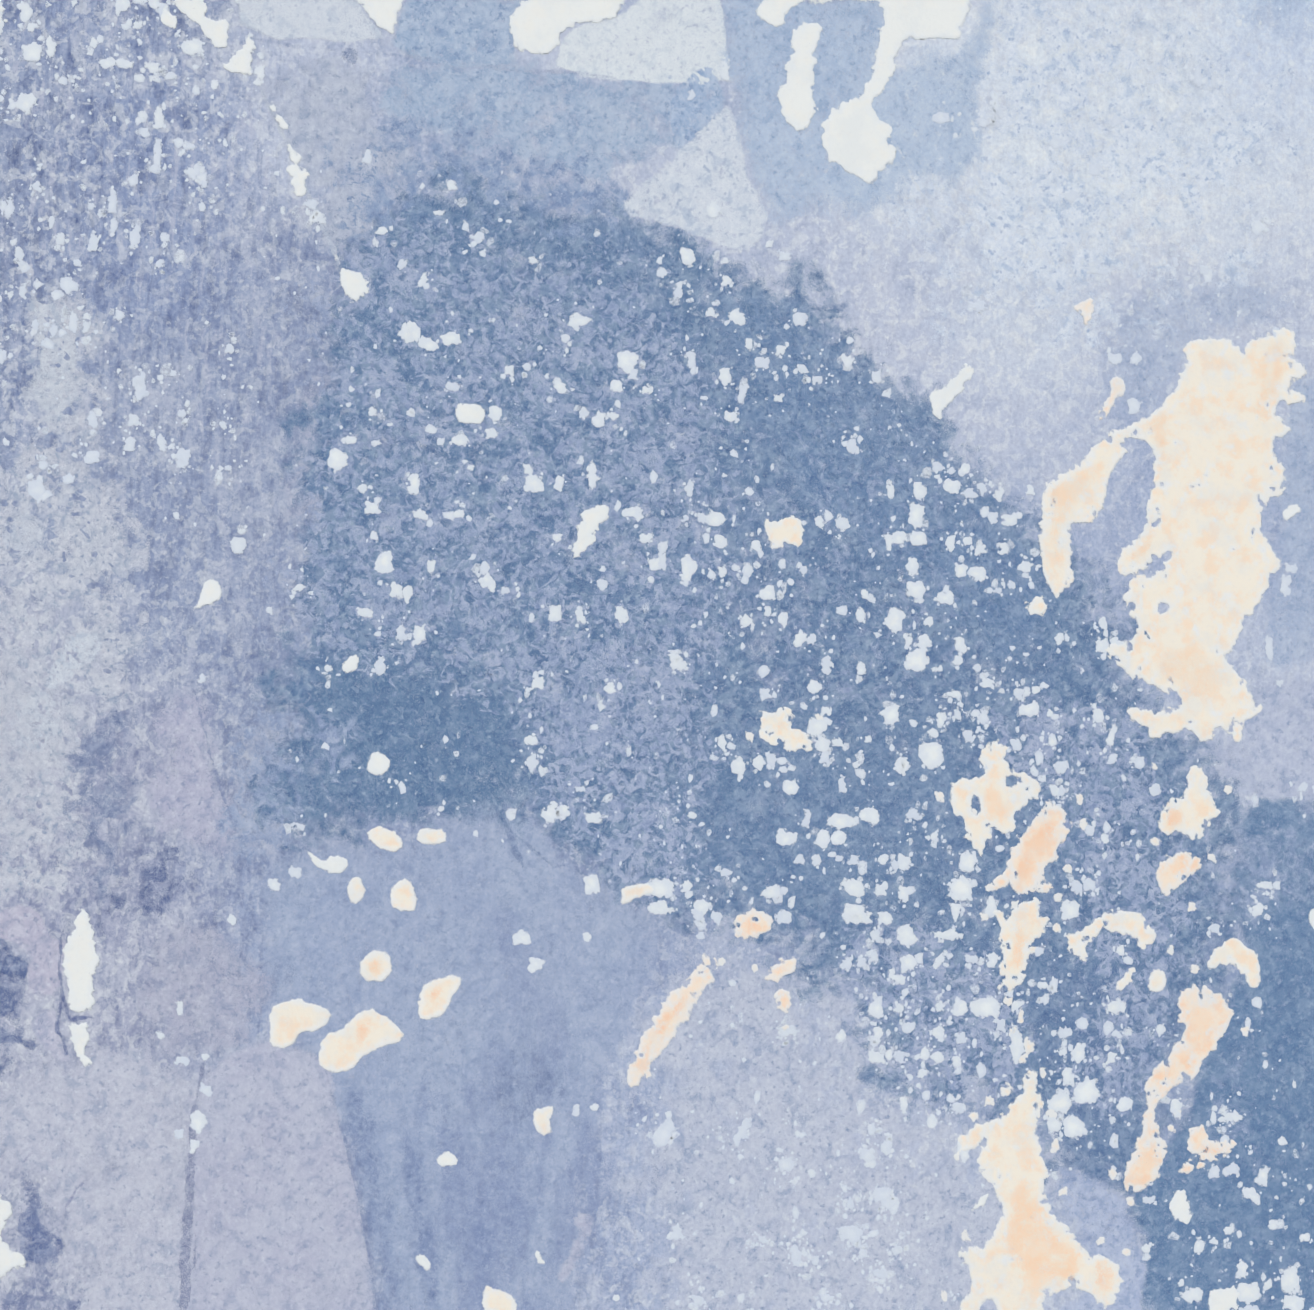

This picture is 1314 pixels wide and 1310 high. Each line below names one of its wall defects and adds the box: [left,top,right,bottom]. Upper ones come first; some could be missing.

peeling [504,0,626,55]
peeling [756,0,972,184]
peeling [335,254,370,313]
peeling [393,311,567,527]
peeling [500,299,660,436]
peeling [316,474,440,689]
peeling [358,745,422,807]
peeling [367,799,476,852]
peeling [529,220,1314,1310]
peeling [62,909,100,1067]
peeling [268,998,404,1073]
peeling [418,974,462,1020]